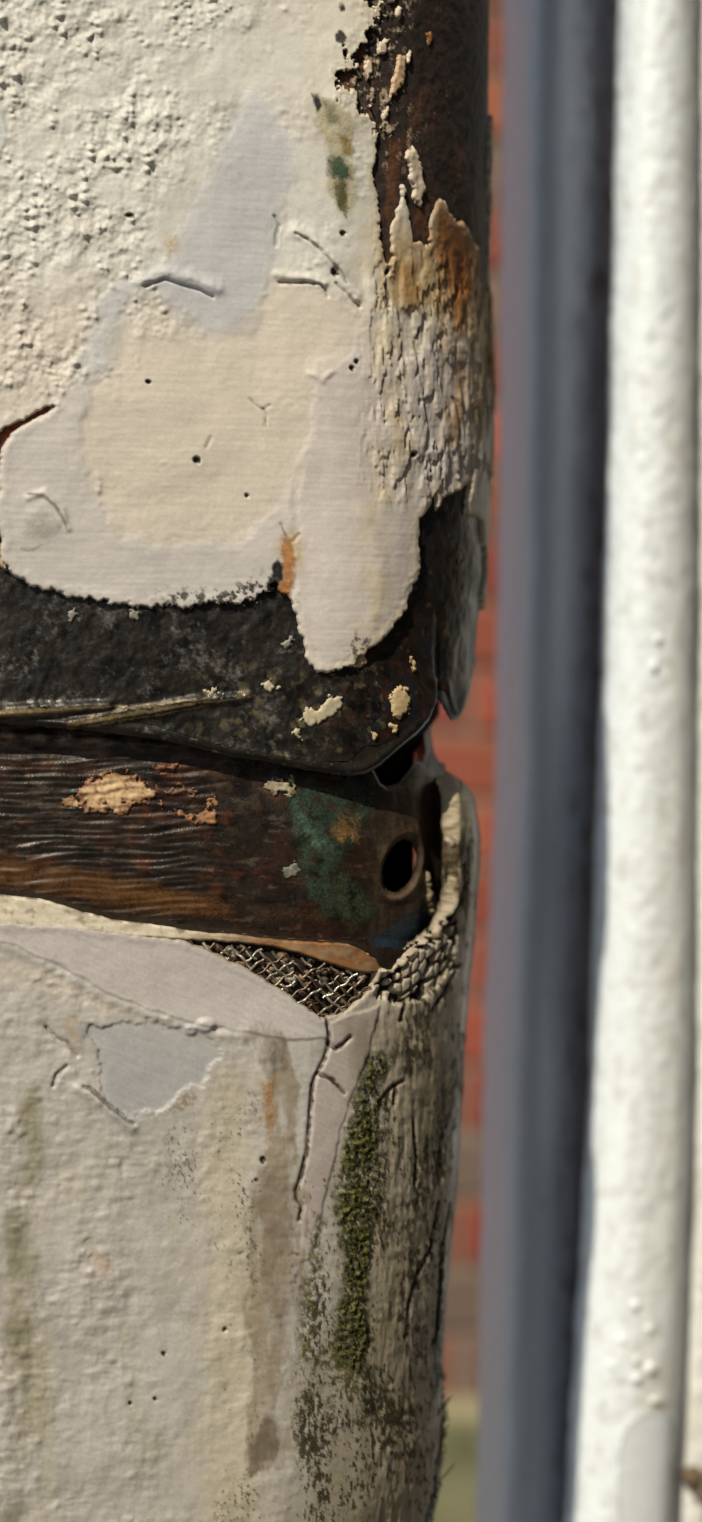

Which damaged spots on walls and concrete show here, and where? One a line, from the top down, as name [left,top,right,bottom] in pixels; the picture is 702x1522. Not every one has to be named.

peeling [335,0,490,291]
spalling [0,406,52,460]
peeling [0,485,483,799]
peeling [61,762,222,826]
corrosion [0,859,230,916]
peeling [282,861,302,879]
peeling [424,871,438,918]
spalling [187,939,388,1016]
crack [295,1016,351,1220]
water stain [233,966,467,1522]
water stain [217,1419,278,1522]